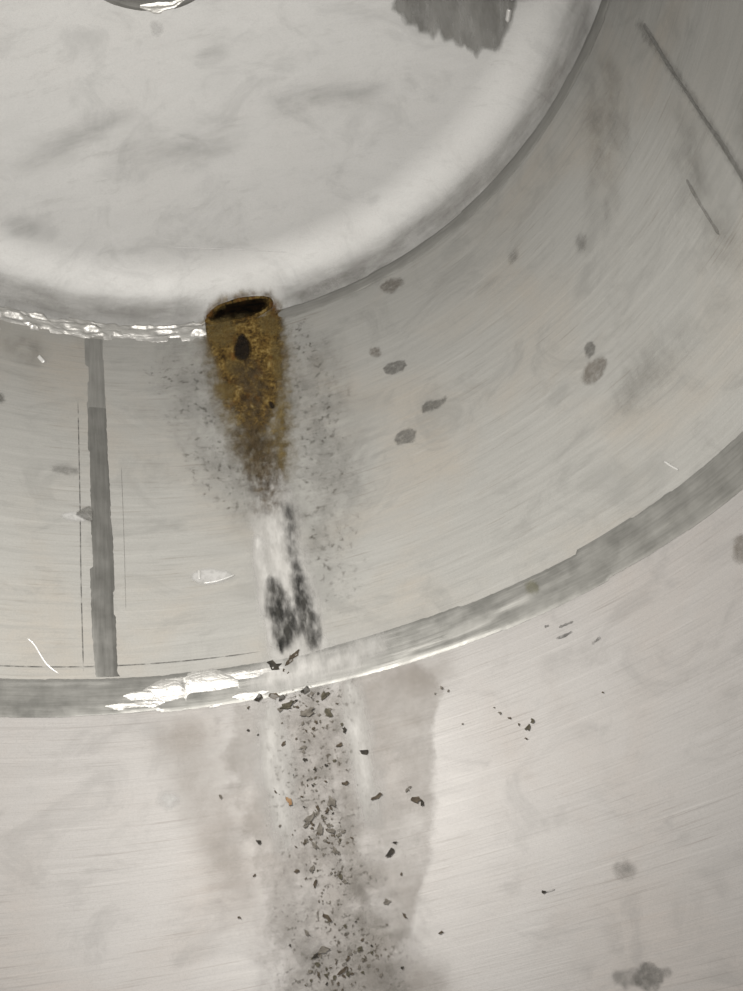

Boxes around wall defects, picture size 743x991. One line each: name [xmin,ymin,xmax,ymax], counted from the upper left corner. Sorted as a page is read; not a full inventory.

corrosion [205,294,290,501]
leakage [252,474,382,689]
leakage [261,708,290,830]
leakage [345,683,374,810]